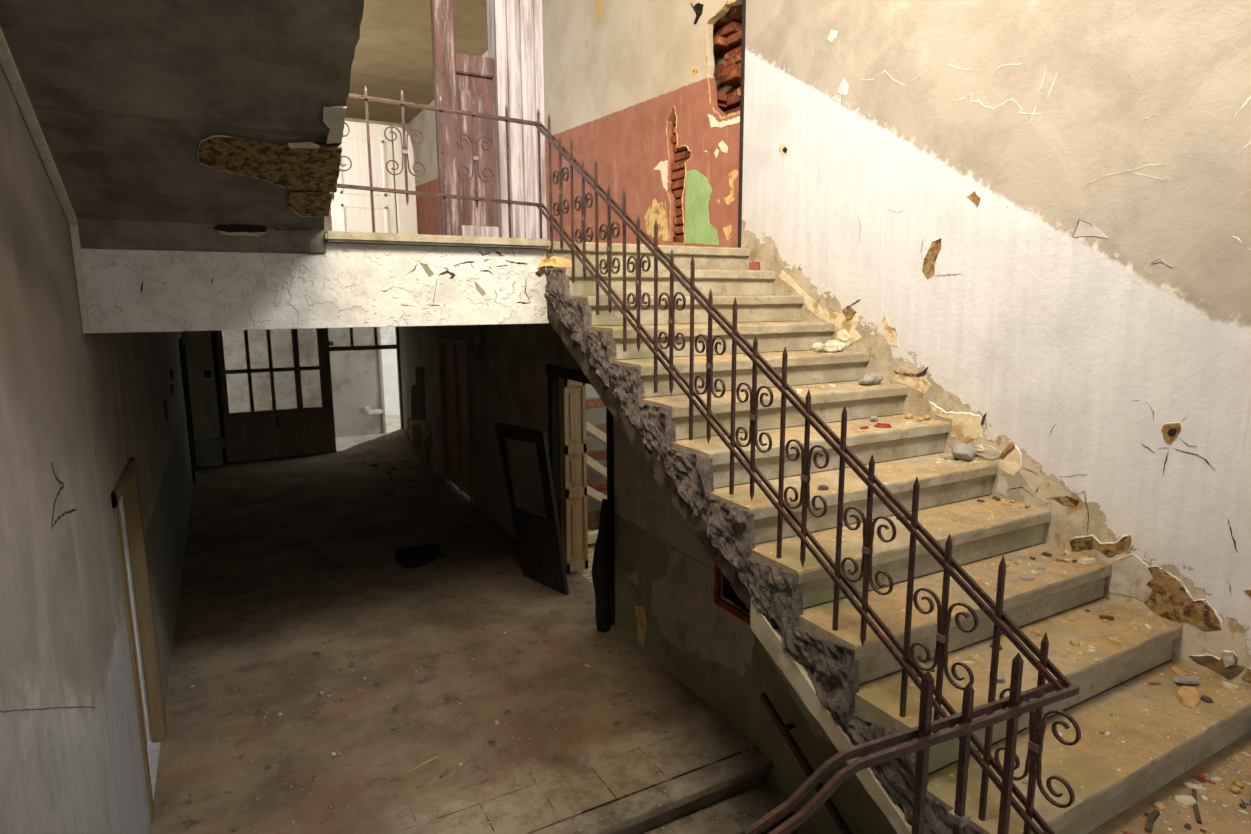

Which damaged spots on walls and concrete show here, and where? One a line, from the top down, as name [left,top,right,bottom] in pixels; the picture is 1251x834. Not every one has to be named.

flaking render [197,106,347,217]
spalling [644,0,742,245]
flaking render [921,238,959,280]
spalling [1144,416,1216,474]
flaking render [978,534,1223,663]